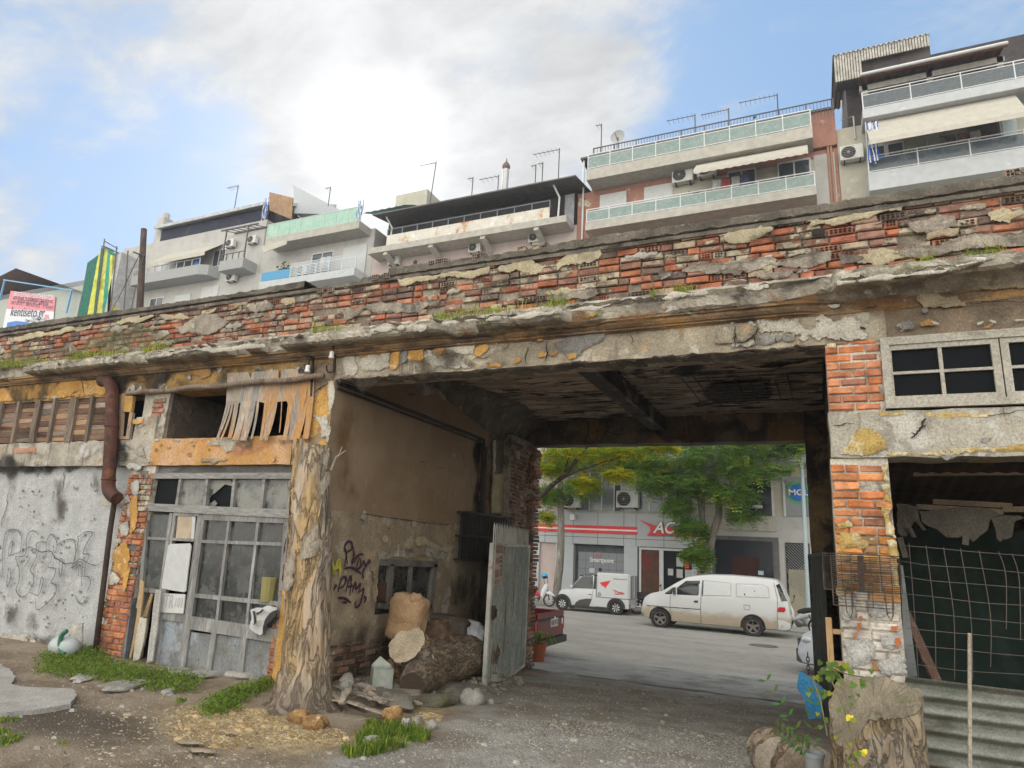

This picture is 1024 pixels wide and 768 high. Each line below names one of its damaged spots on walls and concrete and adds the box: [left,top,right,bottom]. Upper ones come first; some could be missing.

peeling [808,204,902,235]
peeling [398,247,601,286]
peeling [658,215,1024,285]
peeling [8,324,92,342]
peeling [112,300,276,363]
damp [441,353,457,367]
peeling [342,298,610,376]
peeling [713,303,867,349]
crack [910,418,926,439]
damp [57,485,65,517]
peeling [108,436,253,591]
peeling [834,428,1024,589]